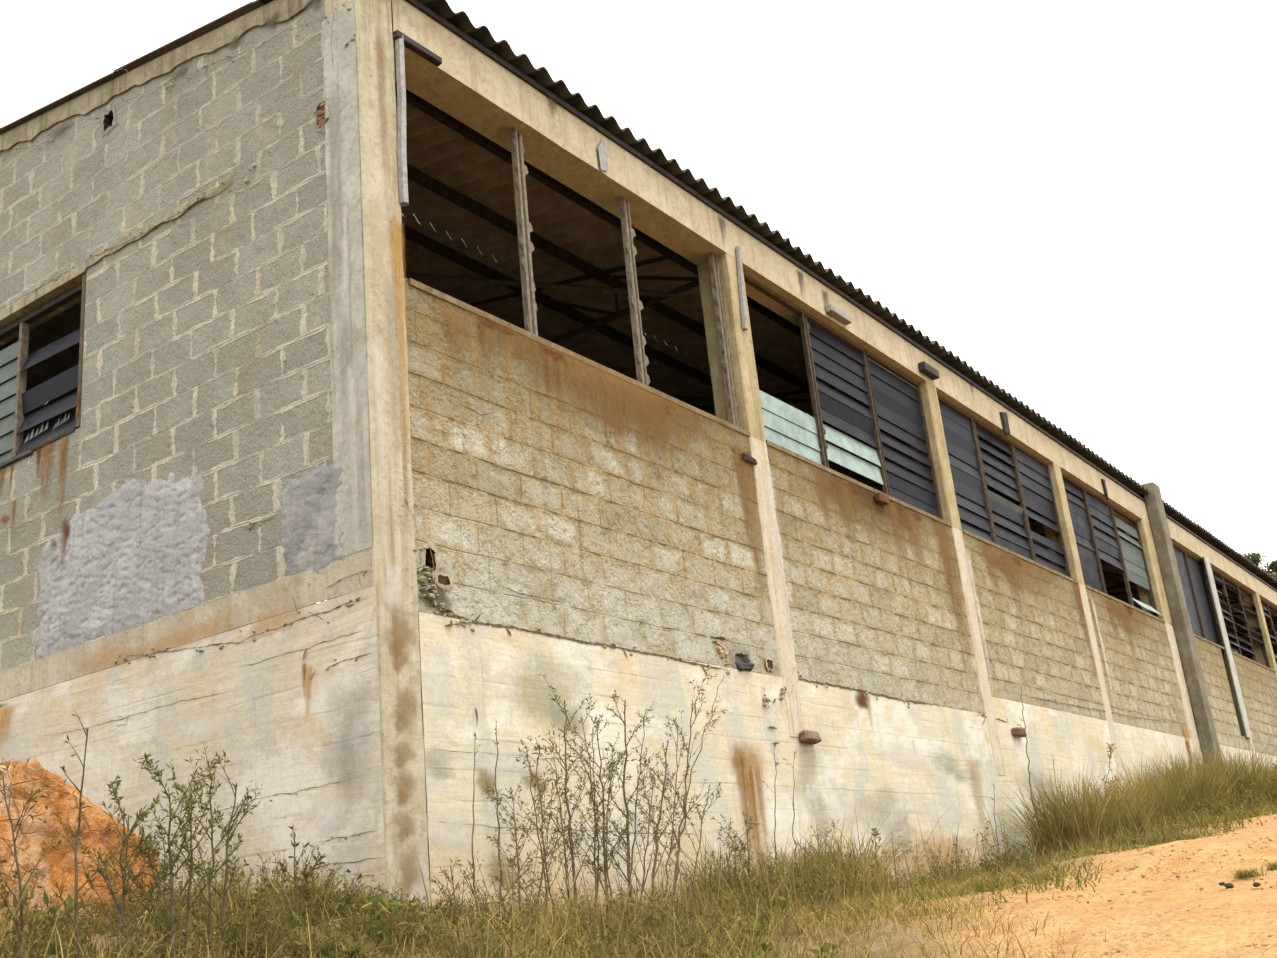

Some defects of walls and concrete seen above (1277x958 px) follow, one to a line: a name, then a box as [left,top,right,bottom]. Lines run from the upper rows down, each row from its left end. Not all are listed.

crack [4,2,355,153]
corrosion [37,437,67,484]
corrosion [51,520,69,553]
spalling [411,540,455,627]
crack [52,570,369,735]
spalling [711,636,774,672]
corrosion [302,664,310,693]
spalling [763,686,787,708]
corrosion [857,691,868,707]
crack [174,768,371,824]
corrosion [735,753,762,821]
crack [318,831,378,871]